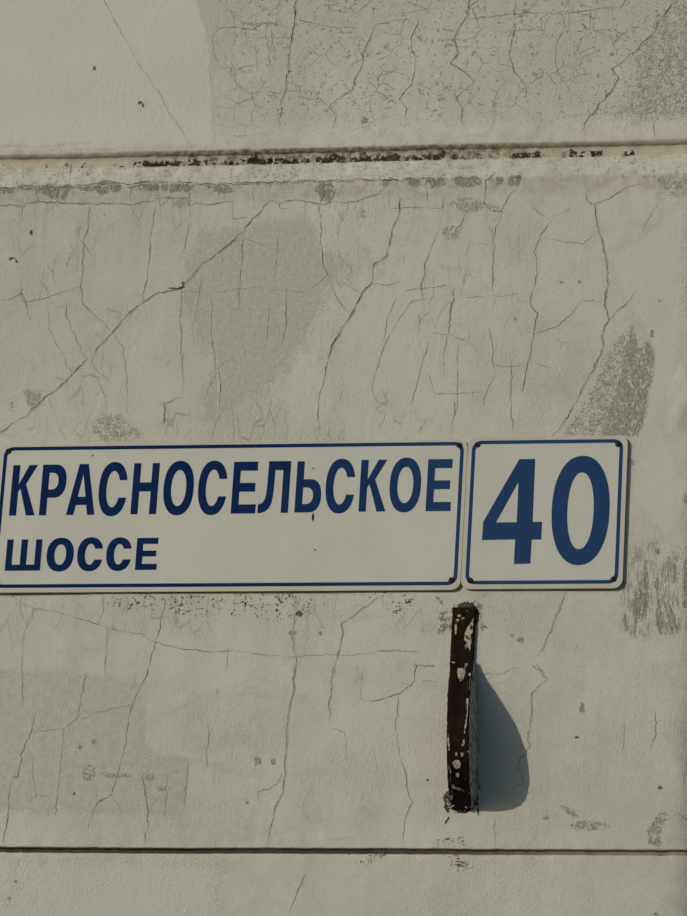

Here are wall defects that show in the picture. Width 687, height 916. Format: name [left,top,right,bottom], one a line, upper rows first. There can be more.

crack [209,0,680,137]
crack [0,168,635,440]
peeling [565,324,657,437]
crack [0,593,437,845]
crack [477,590,568,789]